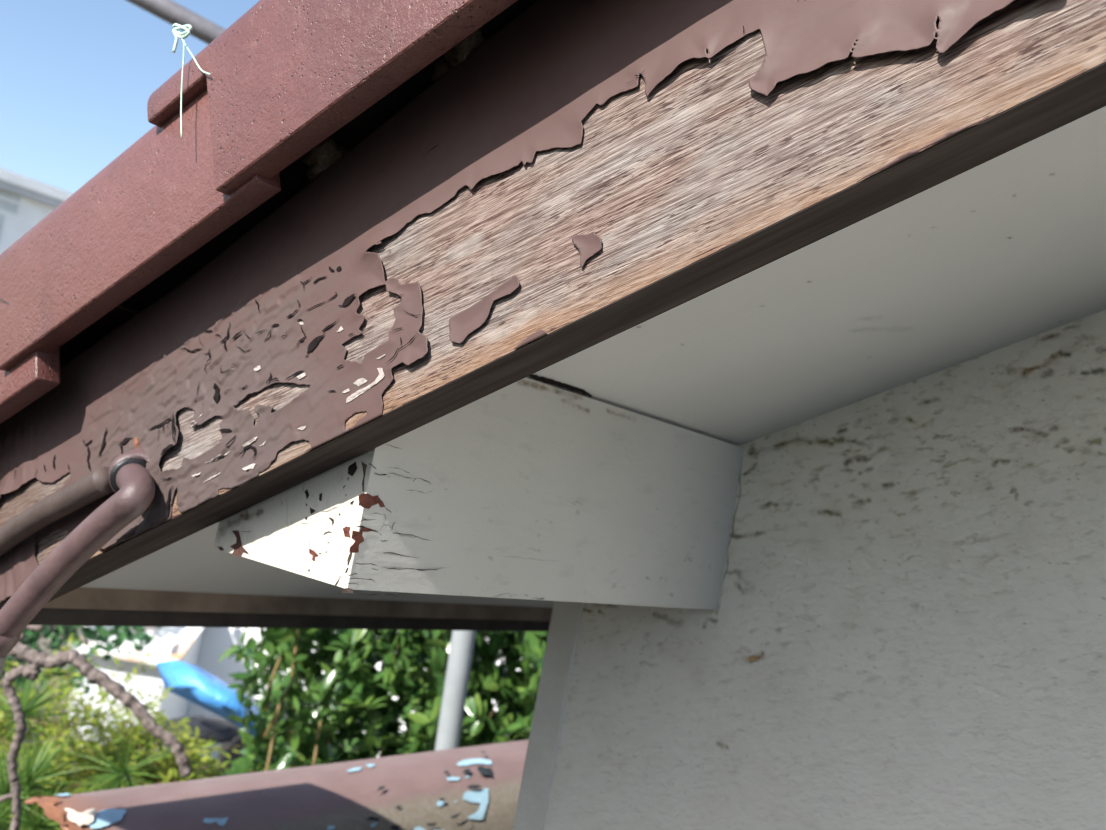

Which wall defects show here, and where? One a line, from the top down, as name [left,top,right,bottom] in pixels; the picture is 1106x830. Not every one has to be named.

peeling [337,0,1106,434]
peeling [234,372,310,447]
peeling [0,472,70,527]
peeling [167,489,188,521]
peeling [159,407,228,482]
peeling [242,426,320,476]
peeling [343,461,385,509]
crack [368,444,431,494]
peeling [35,529,70,565]
peeling [218,530,249,557]
peeling [329,513,376,573]
crack [286,501,448,596]